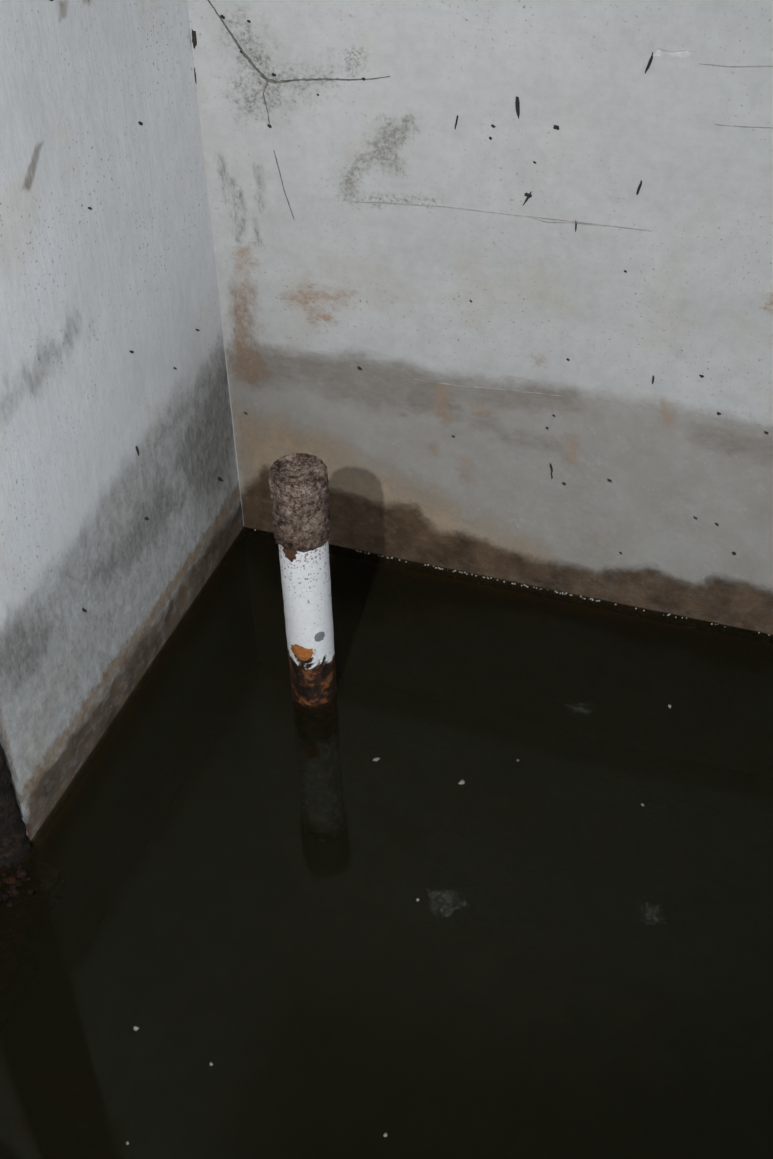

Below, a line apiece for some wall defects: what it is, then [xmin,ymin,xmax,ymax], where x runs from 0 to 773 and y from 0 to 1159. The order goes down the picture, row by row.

crack [207,0,390,219]
rust [291,644,314,661]
leakage [0,350,773,845]